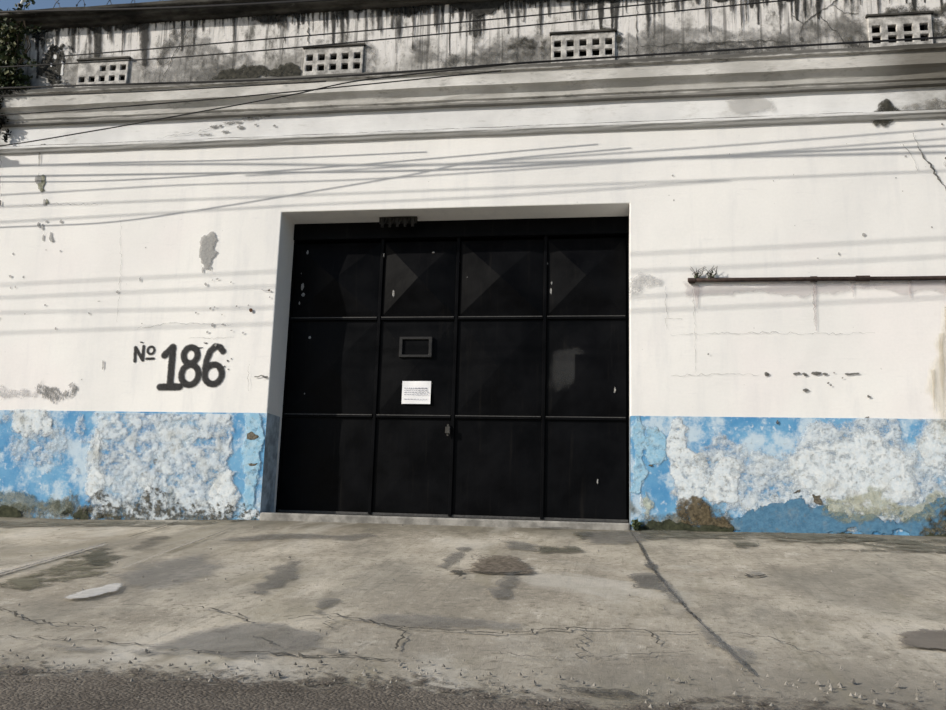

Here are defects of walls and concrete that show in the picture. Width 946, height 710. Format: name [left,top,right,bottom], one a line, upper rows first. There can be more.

water stain [27,0,627,80]
water stain [644,0,683,37]
water stain [695,0,822,32]
water stain [877,0,946,43]
water stain [872,98,946,126]
crack [918,147,946,189]
peeling [35,175,49,205]
peeling [199,232,219,286]
peeling [2,409,265,520]
peeling [630,416,946,531]
crack [0,604,840,660]